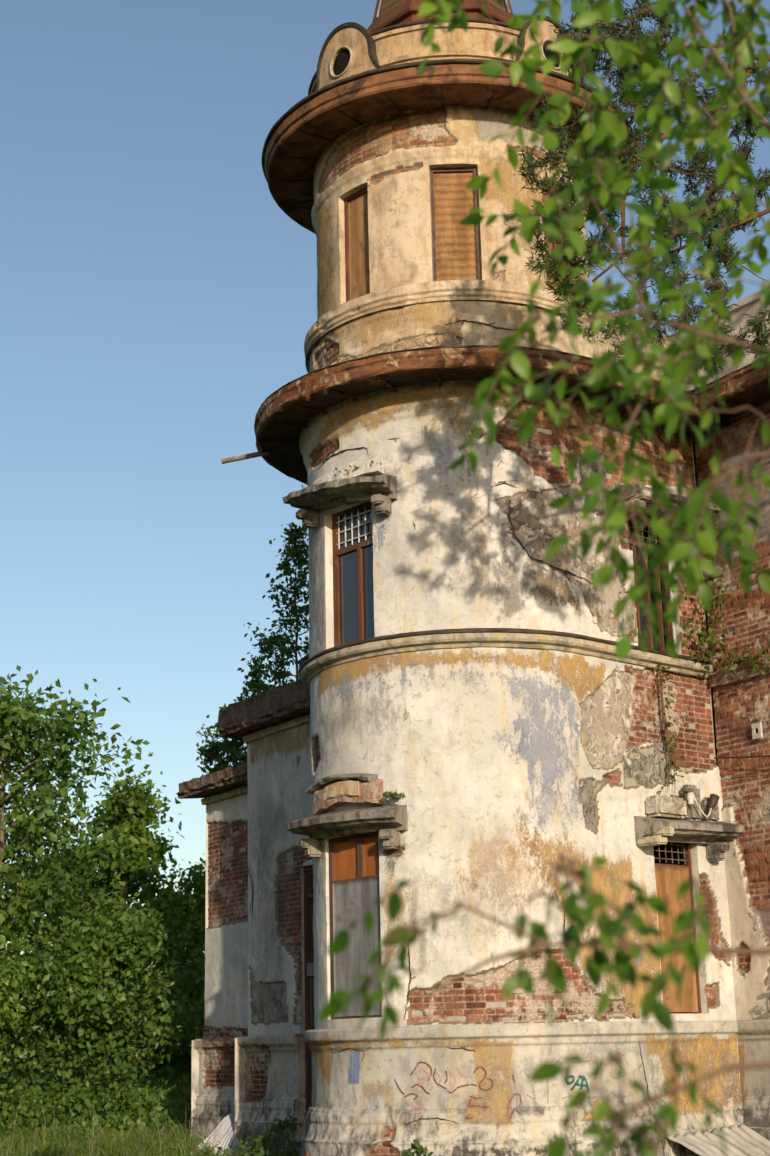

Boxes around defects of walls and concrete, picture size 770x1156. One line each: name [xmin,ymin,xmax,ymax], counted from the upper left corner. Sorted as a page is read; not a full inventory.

flaking render [316,106,455,320]
flaking render [313,380,770,942]
flaking render [208,821,248,929]
flaking render [201,847,311,1102]
peeling [303,1038,513,1124]
flaking render [410,829,662,1023]
flaking render [704,984,723,1006]
flaking render [698,874,751,977]